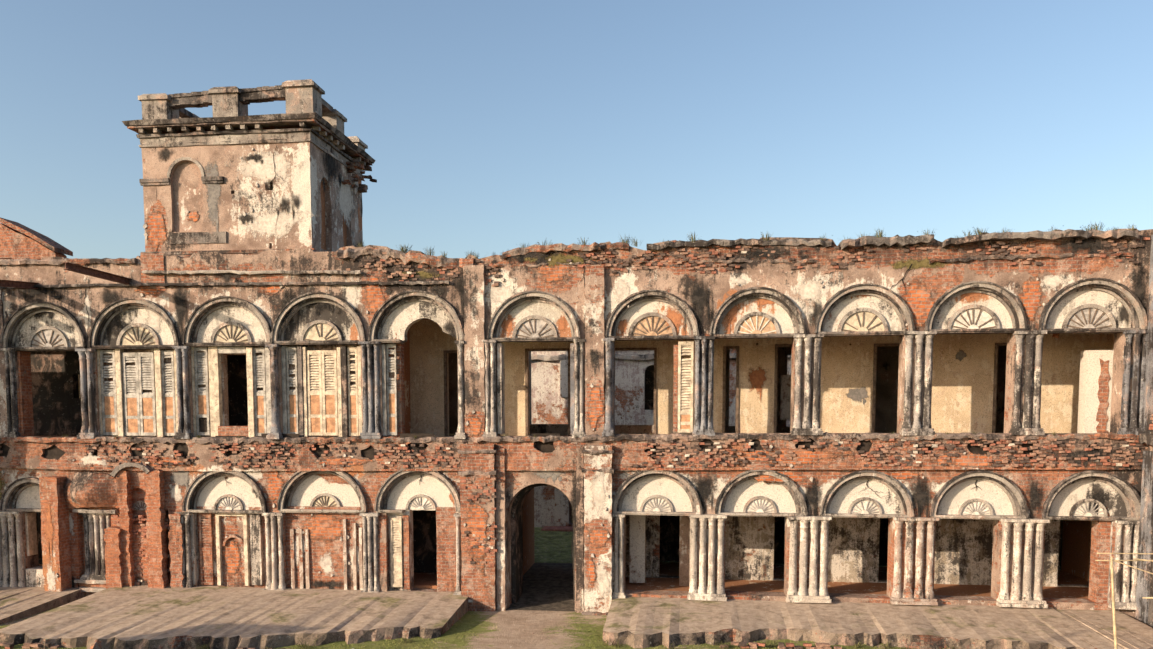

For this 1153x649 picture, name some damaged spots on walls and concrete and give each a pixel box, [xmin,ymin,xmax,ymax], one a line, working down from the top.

damp [322,143,342,193]
damp [277,195,299,219]
flaking render [143,206,167,252]
flaking render [535,258,572,283]
peeling [796,280,824,302]
flaking render [902,279,935,329]
flaking render [1019,274,1069,322]
peeling [73,452,106,466]
flaking render [318,454,373,466]
peeling [169,484,182,505]
flaking render [587,523,611,598]
peeling [46,565,59,592]